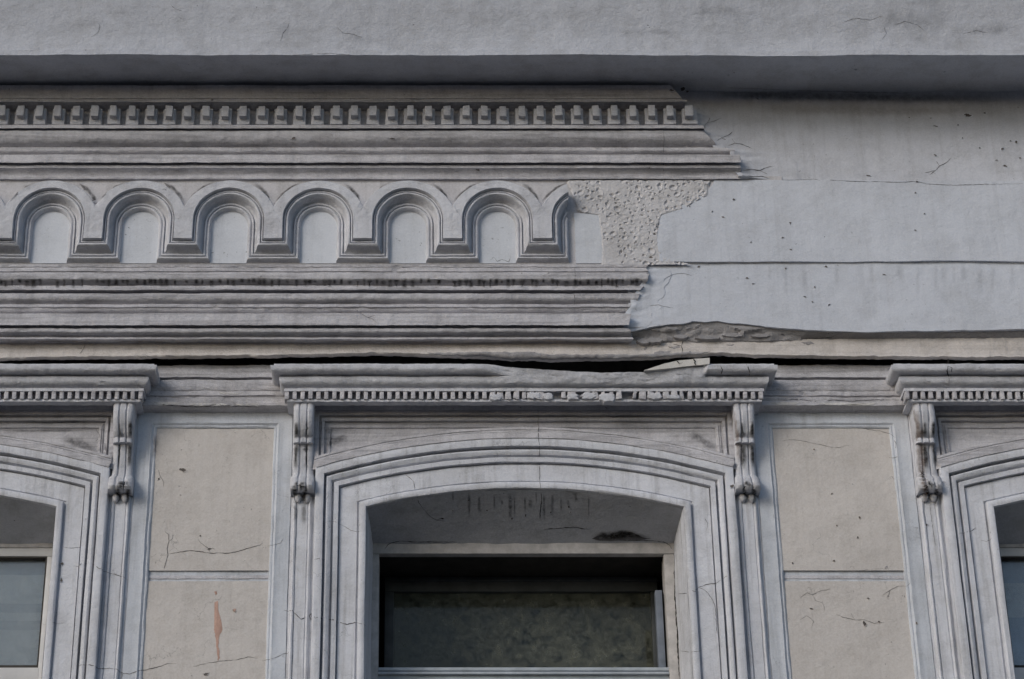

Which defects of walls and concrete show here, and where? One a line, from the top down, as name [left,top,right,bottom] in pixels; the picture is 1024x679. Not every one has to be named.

crack [706,118,772,178]
spalling [567,180,710,268]
spalling [633,323,814,354]
crack [164,533,283,567]
peeling [592,532,649,541]